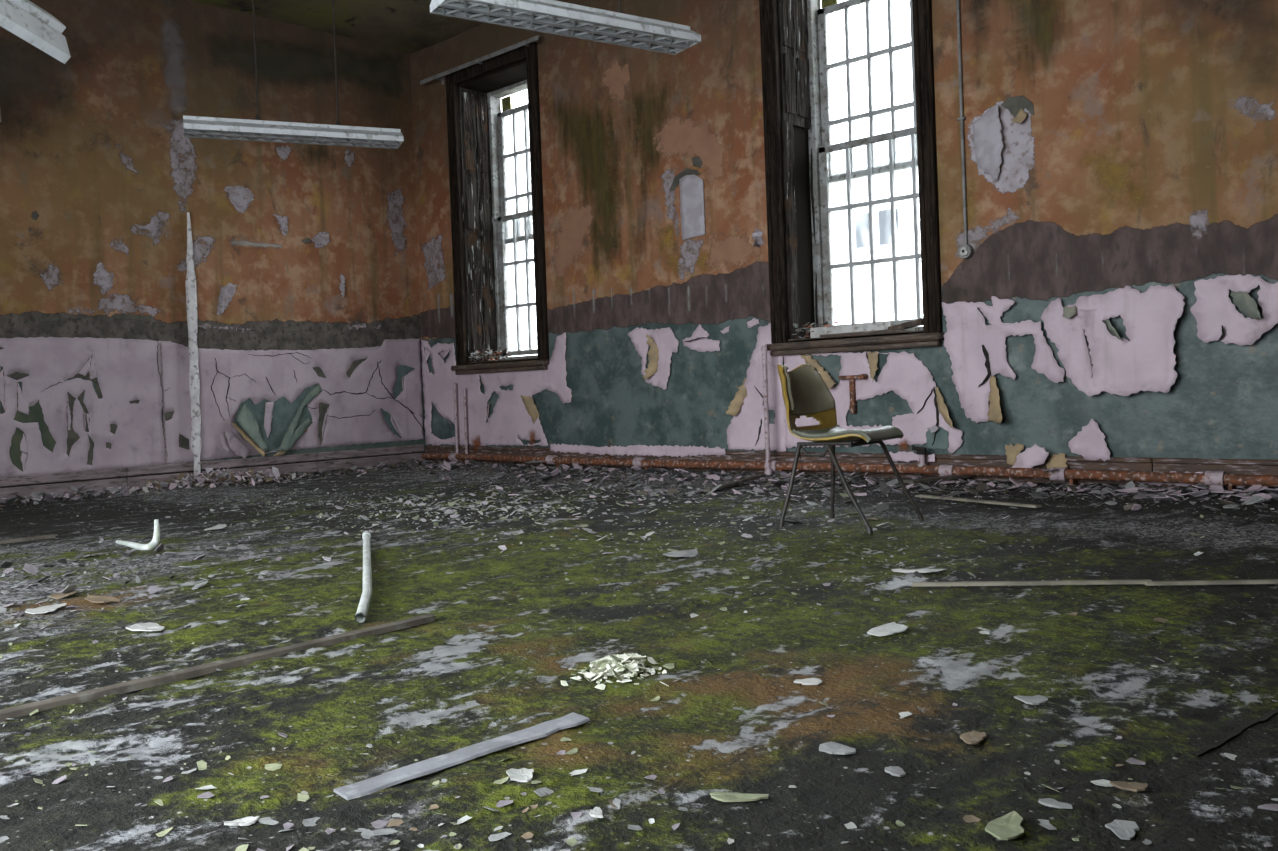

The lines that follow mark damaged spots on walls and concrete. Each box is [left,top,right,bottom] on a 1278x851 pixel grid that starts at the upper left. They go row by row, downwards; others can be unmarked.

water stain [559,109,618,259]
water stain [635,93,664,194]
flaking render [967,96,1035,194]
flaking render [1231,96,1275,120]
spalling [0,116,1278,471]
crack [211,352,425,432]